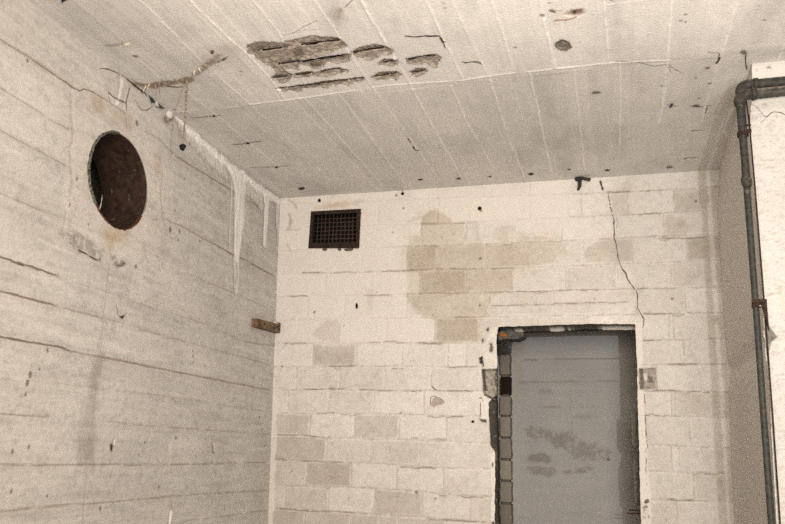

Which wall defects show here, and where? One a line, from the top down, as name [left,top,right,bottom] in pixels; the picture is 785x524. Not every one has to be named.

spalling [245,34,443,92]
damp [173,114,300,297]
damp [403,209,568,345]
damp [583,237,634,264]
damp [600,178,635,216]
crack [599,180,645,328]